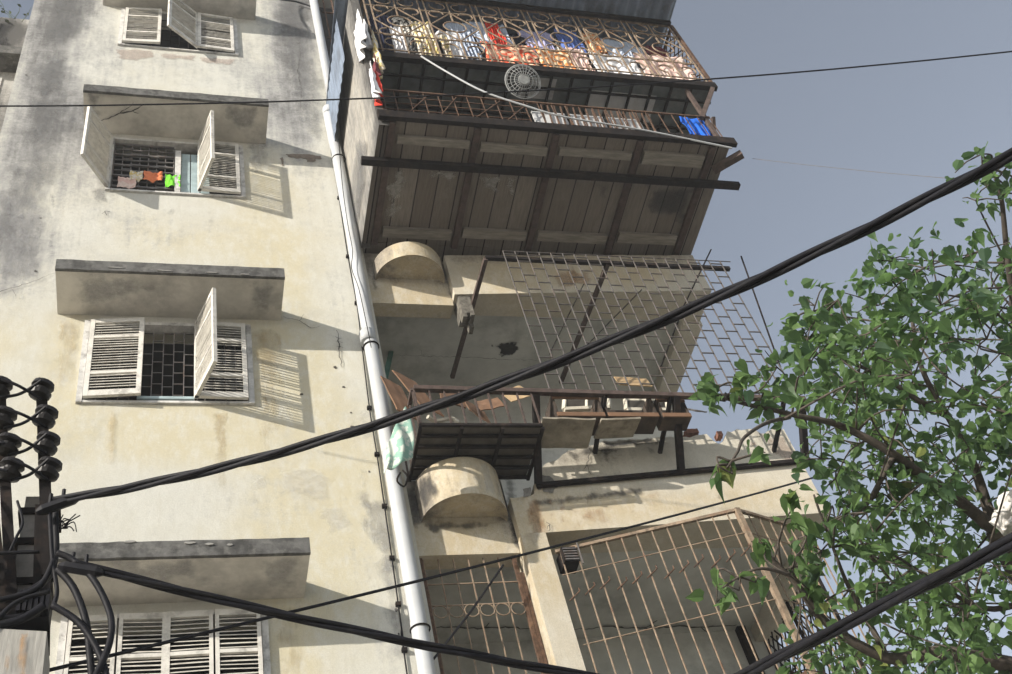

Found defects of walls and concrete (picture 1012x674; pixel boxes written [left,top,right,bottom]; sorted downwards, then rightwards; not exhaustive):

crack [283,316,343,366]
leakage [492,342,518,357]
leakage [408,478,437,523]
leakage [429,523,473,532]